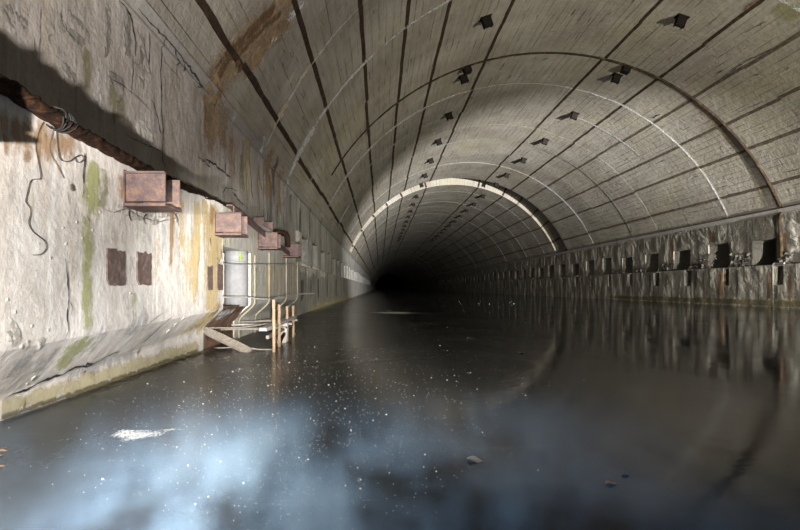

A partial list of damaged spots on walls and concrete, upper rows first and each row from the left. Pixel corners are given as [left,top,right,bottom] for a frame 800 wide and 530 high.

rust [0,114,72,158]
crack [108,1,203,171]
rust [203,0,294,173]
crack [3,258,119,400]
leakage [82,222,92,326]
leakage [0,326,208,420]
rust [170,200,243,340]